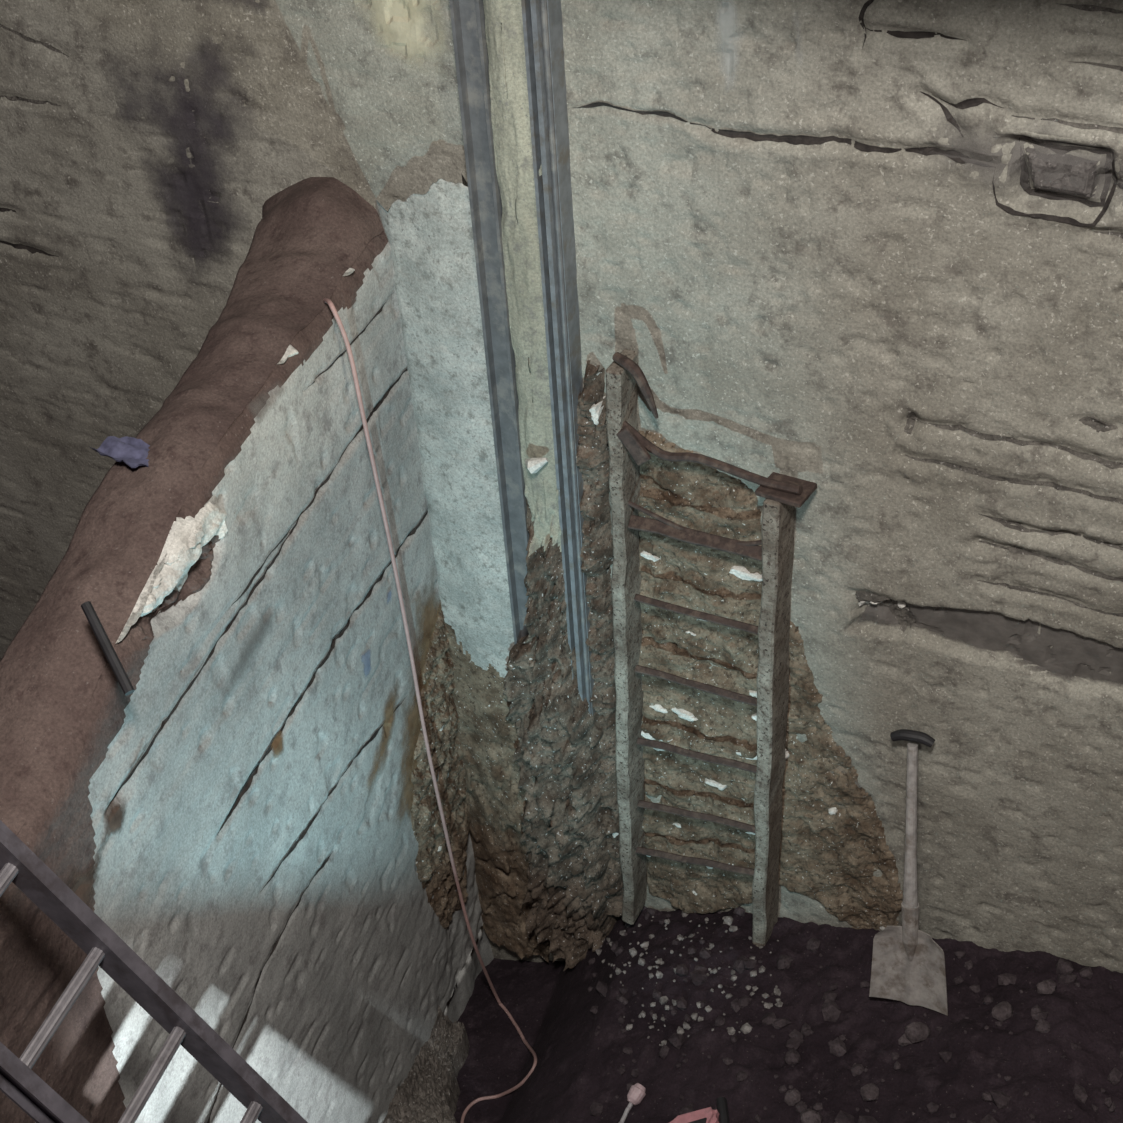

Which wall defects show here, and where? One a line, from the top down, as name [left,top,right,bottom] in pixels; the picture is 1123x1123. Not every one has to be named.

damp [149,46,232,261]
crack [575,91,1123,227]
crack [858,0,967,49]
spalling [116,501,228,646]
crack [106,368,408,812]
crack [217,510,428,835]
crack [261,697,406,891]
spalling [411,600,471,929]
spalling [576,359,624,917]
spalling [638,430,762,914]
spalling [779,621,903,931]